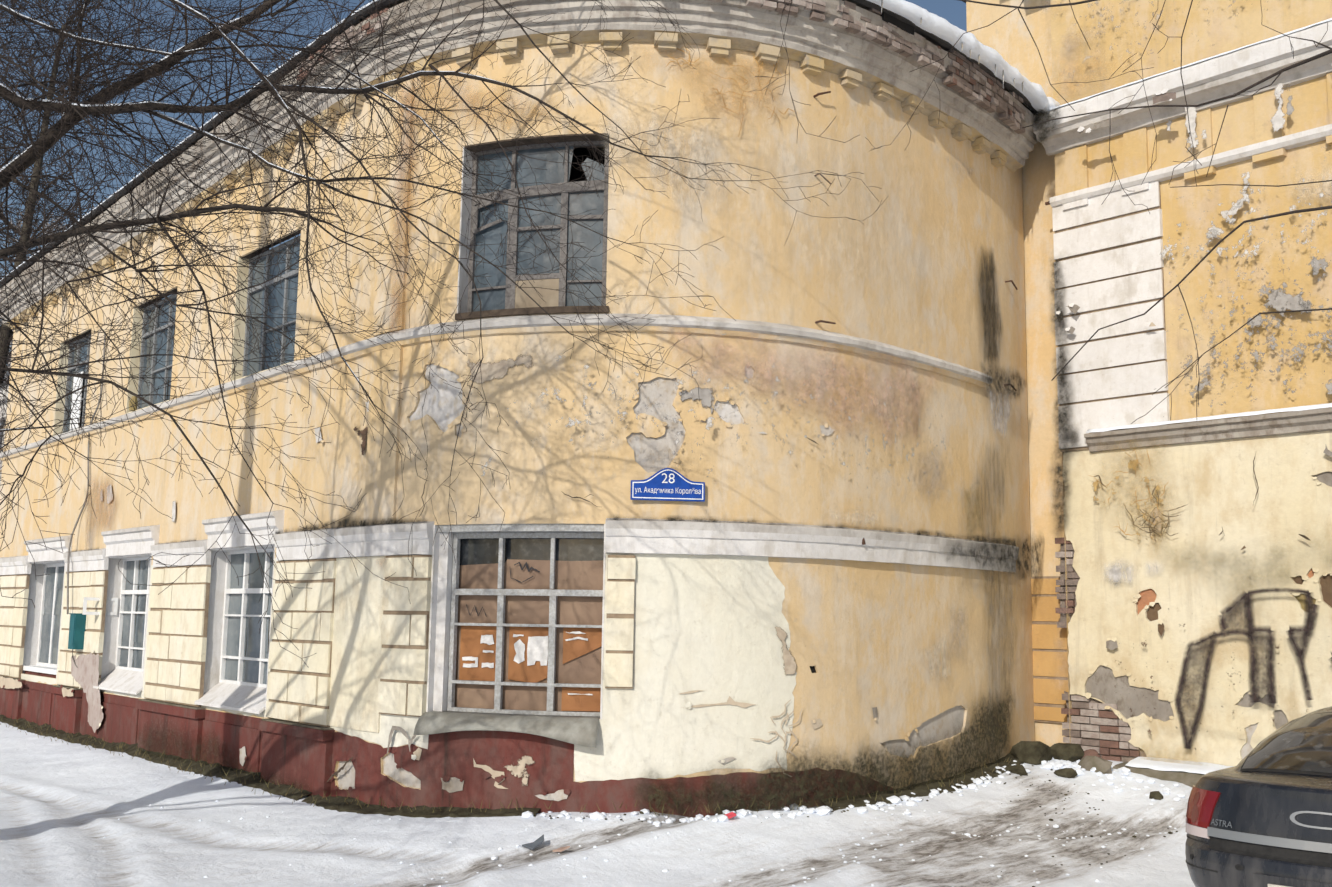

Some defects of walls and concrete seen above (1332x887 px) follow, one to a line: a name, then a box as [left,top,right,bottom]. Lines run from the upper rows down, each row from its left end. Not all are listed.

peeling [1145,167,1332,407]
water stain [979,252,1025,432]
flaking render [409,355,534,437]
flaking render [497,364,947,482]
water stain [1051,260,1077,532]
flaking render [1055,537,1080,628]
flaking render [1291,568,1332,611]
flaking render [60,650,103,733]
flaking render [1061,589,1203,762]
flaking render [332,756,355,792]
flaking render [383,747,422,788]
peeling [473,755,571,801]